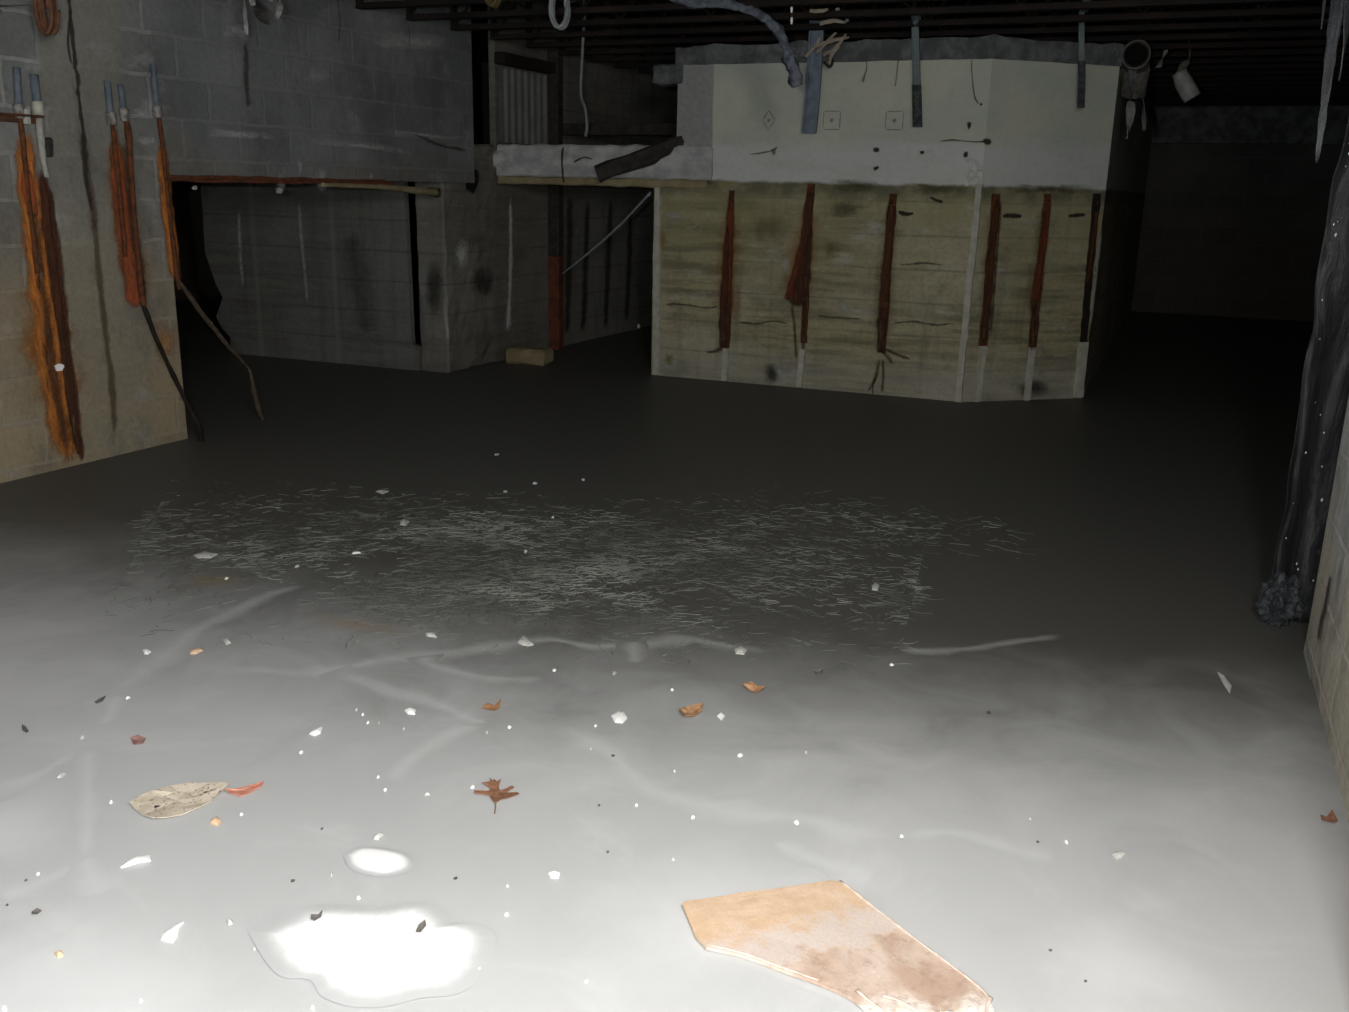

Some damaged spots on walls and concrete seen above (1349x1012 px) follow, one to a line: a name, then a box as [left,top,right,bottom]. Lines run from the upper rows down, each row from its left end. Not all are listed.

corrosion [15,136,84,459]
corrosion [110,136,145,307]
corrosion [157,146,179,278]
corrosion [707,196,735,353]
corrosion [785,192,813,358]
corrosion [869,200,909,393]
corrosion [982,201,1001,344]
corrosion [1030,200,1051,349]
corrosion [1086,198,1100,284]